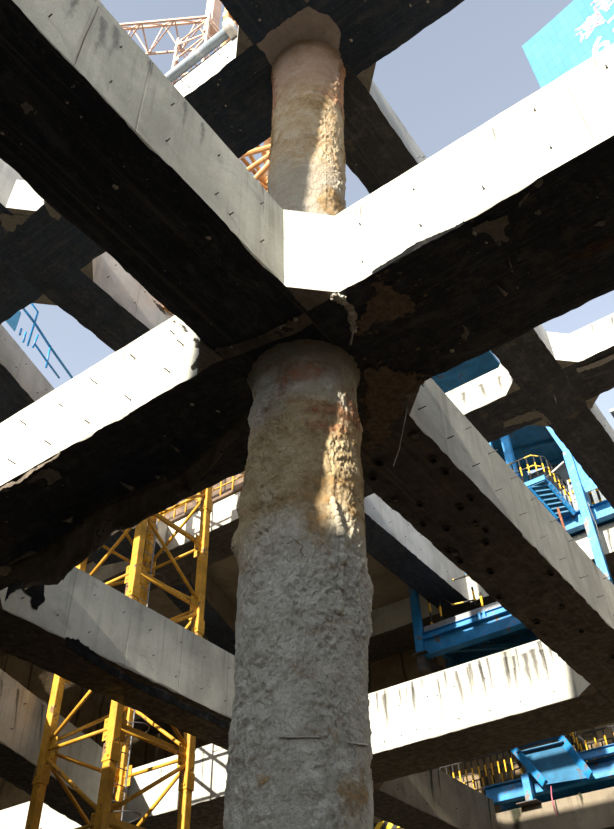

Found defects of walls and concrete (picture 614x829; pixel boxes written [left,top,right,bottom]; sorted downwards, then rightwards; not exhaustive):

peeling [471,215,518,246]
peeling [330,269,427,345]
peeling [576,354,614,373]
peeling [357,357,438,481]
peeling [1,461,70,498]
water stain [504,640,551,673]
water stain [455,657,490,694]